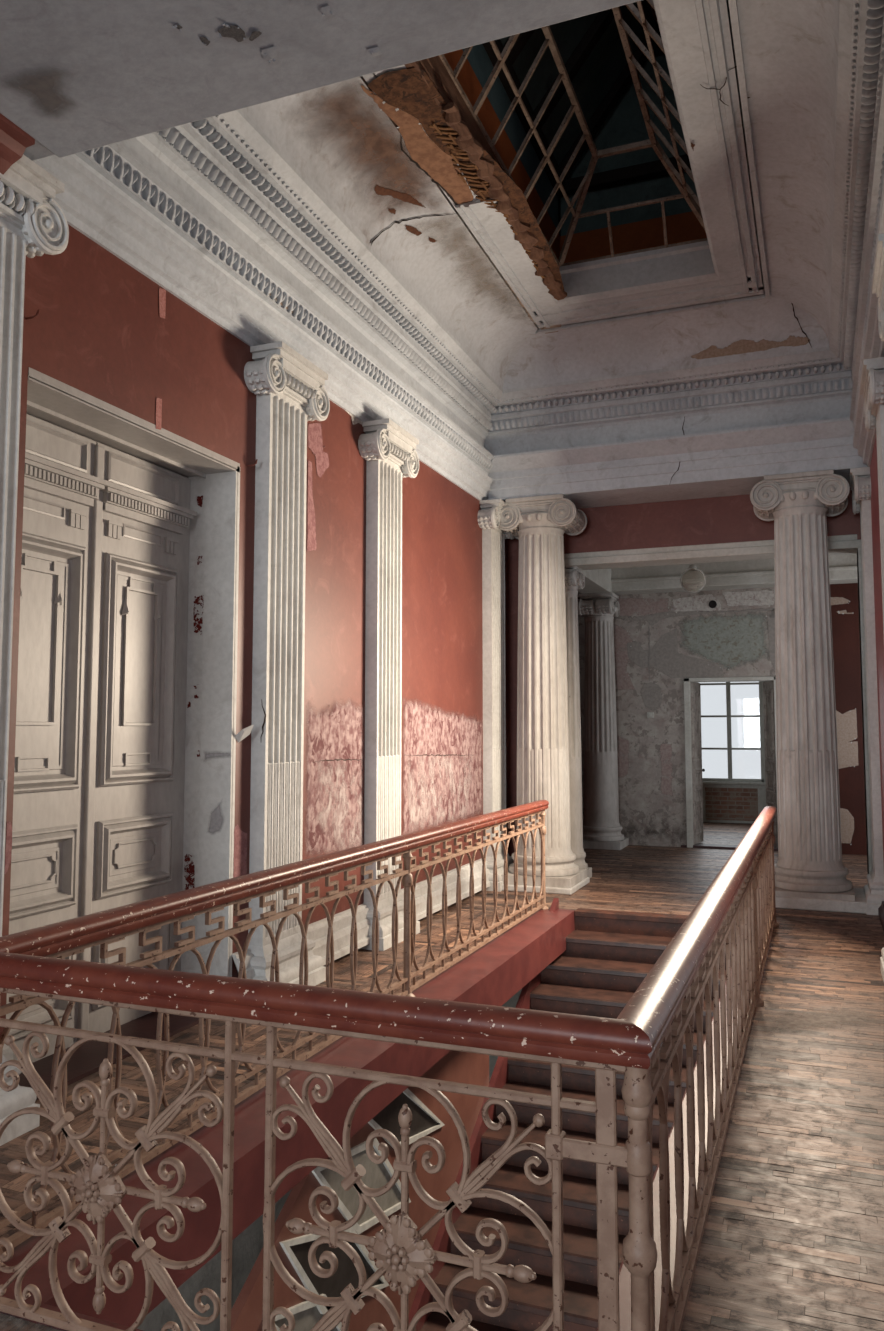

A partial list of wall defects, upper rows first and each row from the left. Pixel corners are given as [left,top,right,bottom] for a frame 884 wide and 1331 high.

peeling [200,23,262,46]
damp [10,72,69,114]
flaking render [361,85,477,204]
crack [371,136,458,245]
flaking render [691,335,811,363]
peeling [670,590,775,617]
peeling [614,624,635,690]
peeling [617,736,629,778]
flaking render [836,708,858,769]
flaking render [705,787,758,821]
flaking render [840,808,854,845]